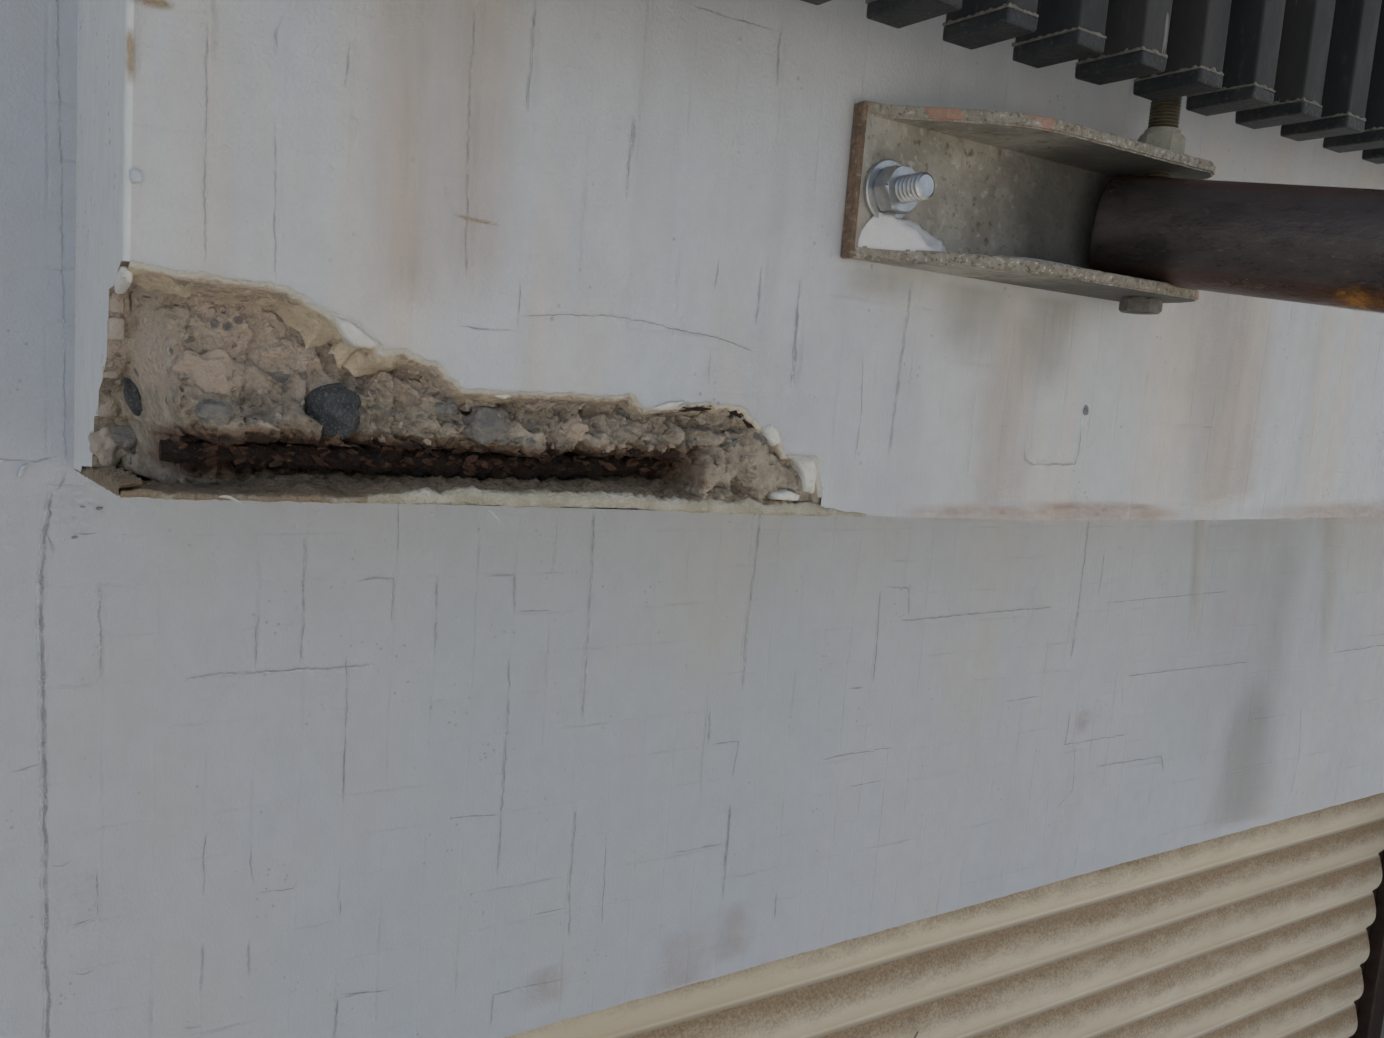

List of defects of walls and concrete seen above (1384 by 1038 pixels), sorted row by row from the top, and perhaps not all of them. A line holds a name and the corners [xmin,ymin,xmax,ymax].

spalling [80,260,866,524]
corrosion [1342,293,1384,311]
crack [39,502,51,843]
crack [41,891,50,1038]